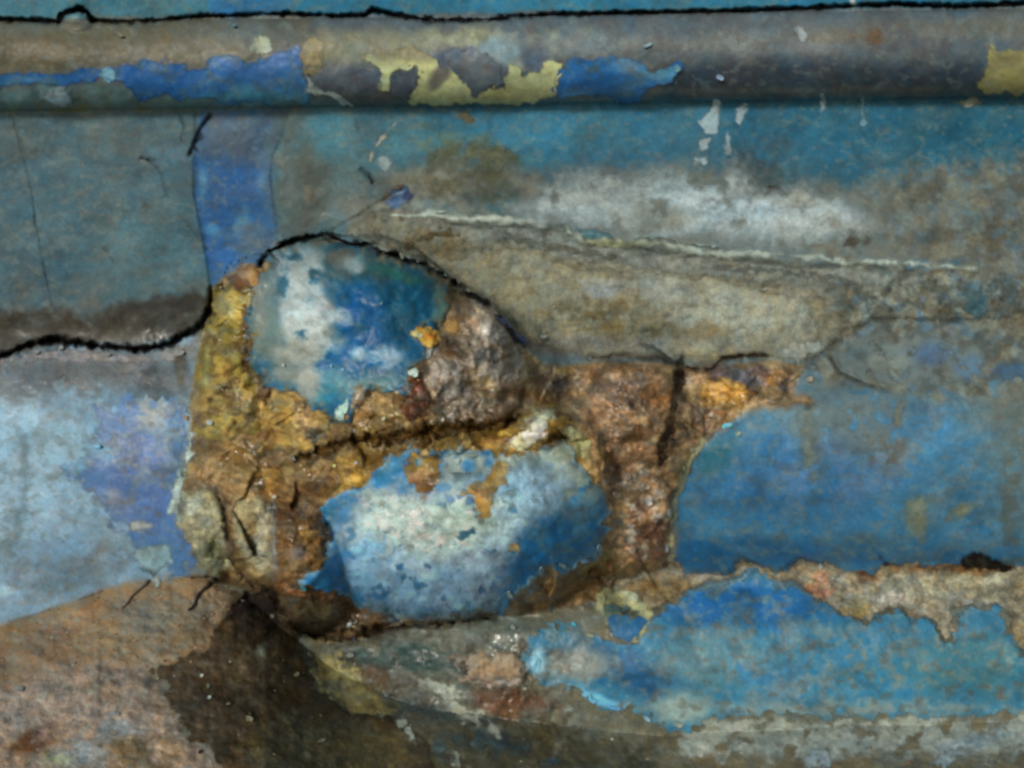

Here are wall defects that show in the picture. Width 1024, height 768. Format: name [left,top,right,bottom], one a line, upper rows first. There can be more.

crack [0,2,1024,23]
peeling [365,34,683,106]
crack [0,293,212,357]
corrosion [183,264,333,461]
corrosion [267,495,354,627]
crack [256,232,526,346]
peeling [296,439,612,620]
corrosion [330,366,672,563]
spalling [243,184,984,479]
peeling [448,438,1024,734]
corrosion [697,364,814,436]
leakage [150,592,648,768]